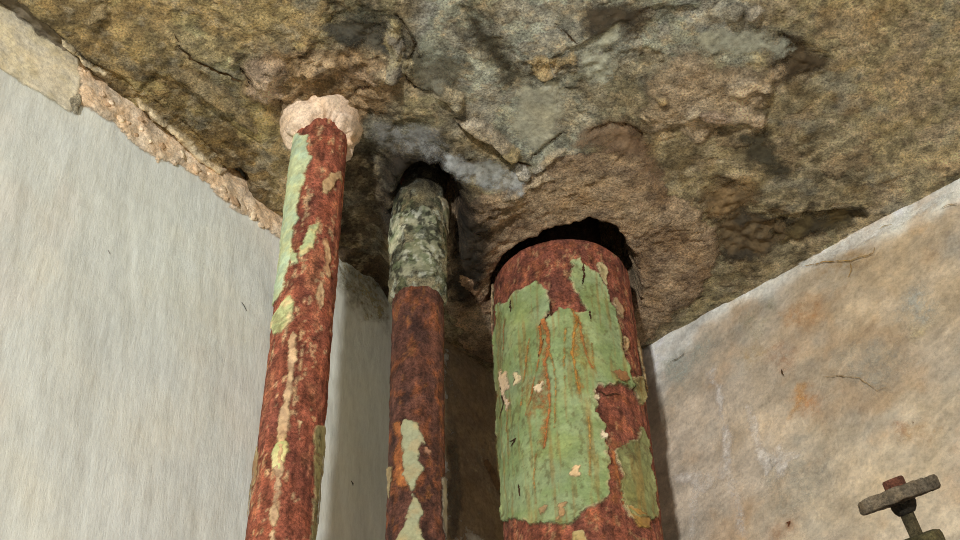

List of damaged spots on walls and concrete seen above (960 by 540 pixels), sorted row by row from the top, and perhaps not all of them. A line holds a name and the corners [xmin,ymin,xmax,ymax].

spalling [0,0,283,238]
crack [175,36,253,87]
leakage [374,122,525,306]
spalling [388,52,787,411]
leakage [738,131,792,180]
crack [805,224,892,277]